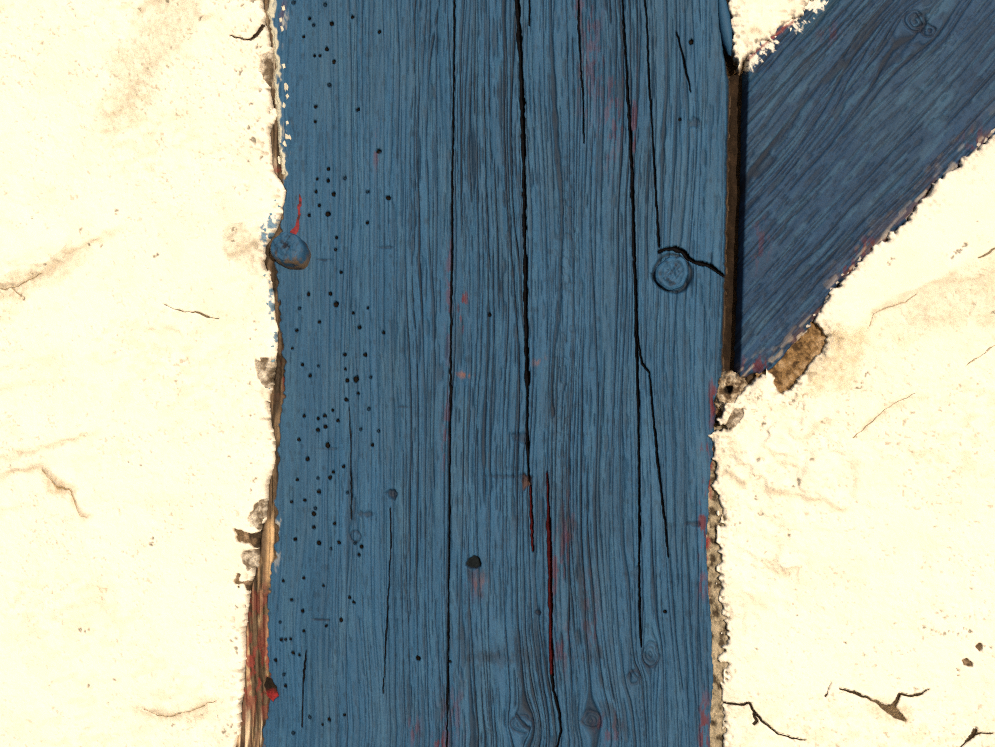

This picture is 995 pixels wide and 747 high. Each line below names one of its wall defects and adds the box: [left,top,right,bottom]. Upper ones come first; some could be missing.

crack [622,0,724,647]
spalling [755,301,827,393]
crack [515,0,562,747]
crack [41,469,87,518]
crack [723,702,805,741]
crack [825,686,929,721]
crack [960,728,993,747]